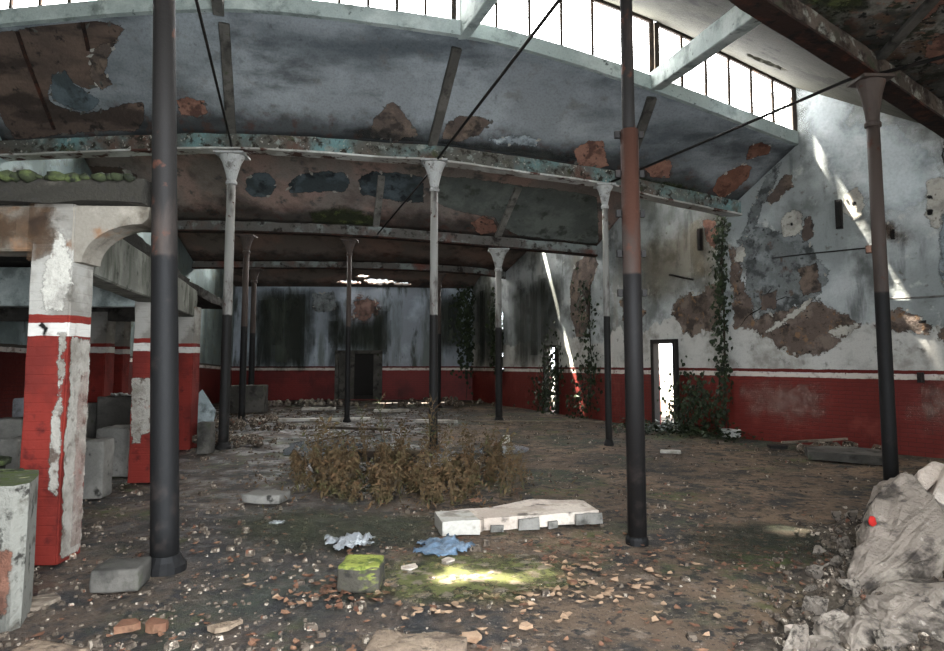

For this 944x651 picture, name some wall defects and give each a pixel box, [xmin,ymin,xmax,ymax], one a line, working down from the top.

peeling [86,39,118,94]
peeling [371,102,418,142]
peeling [443,116,541,147]
peeling [573,141,609,168]
peeling [712,142,772,197]
peeling [671,162,876,358]
spalling [885,221,907,244]
peeling [569,256,599,337]
leakage [255,289,314,371]
leakage [330,307,389,365]
peeling [890,307,944,342]
spalling [48,332,91,558]